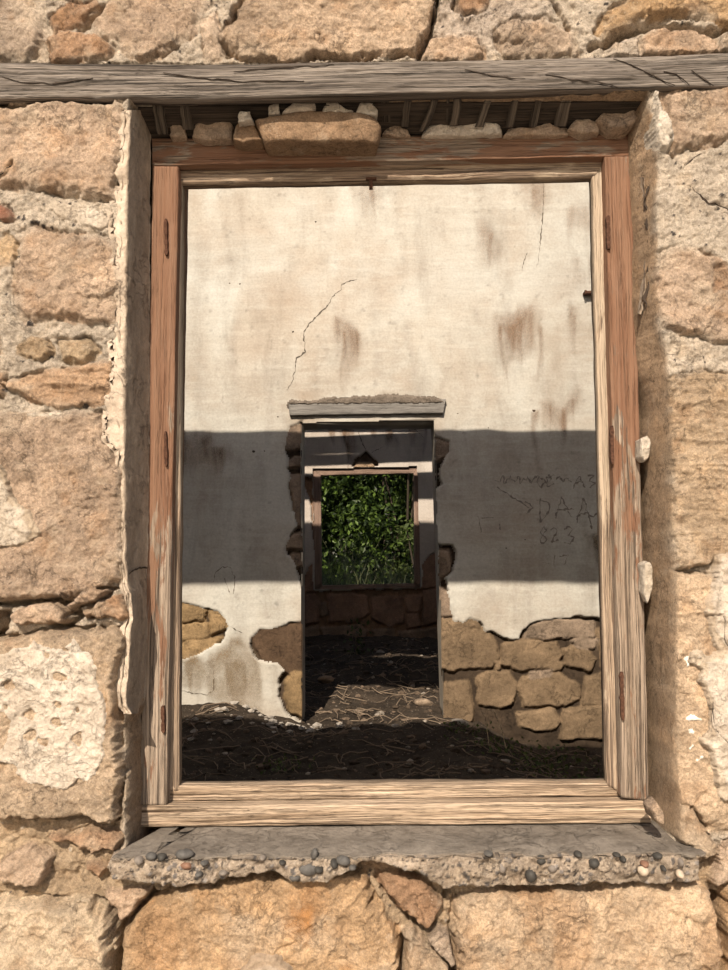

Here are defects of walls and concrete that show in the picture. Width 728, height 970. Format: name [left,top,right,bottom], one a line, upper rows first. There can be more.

crack [685,153,728,210]
crack [288,280,354,388]
peeling [182,602,229,659]
peeling [686,709,728,761]